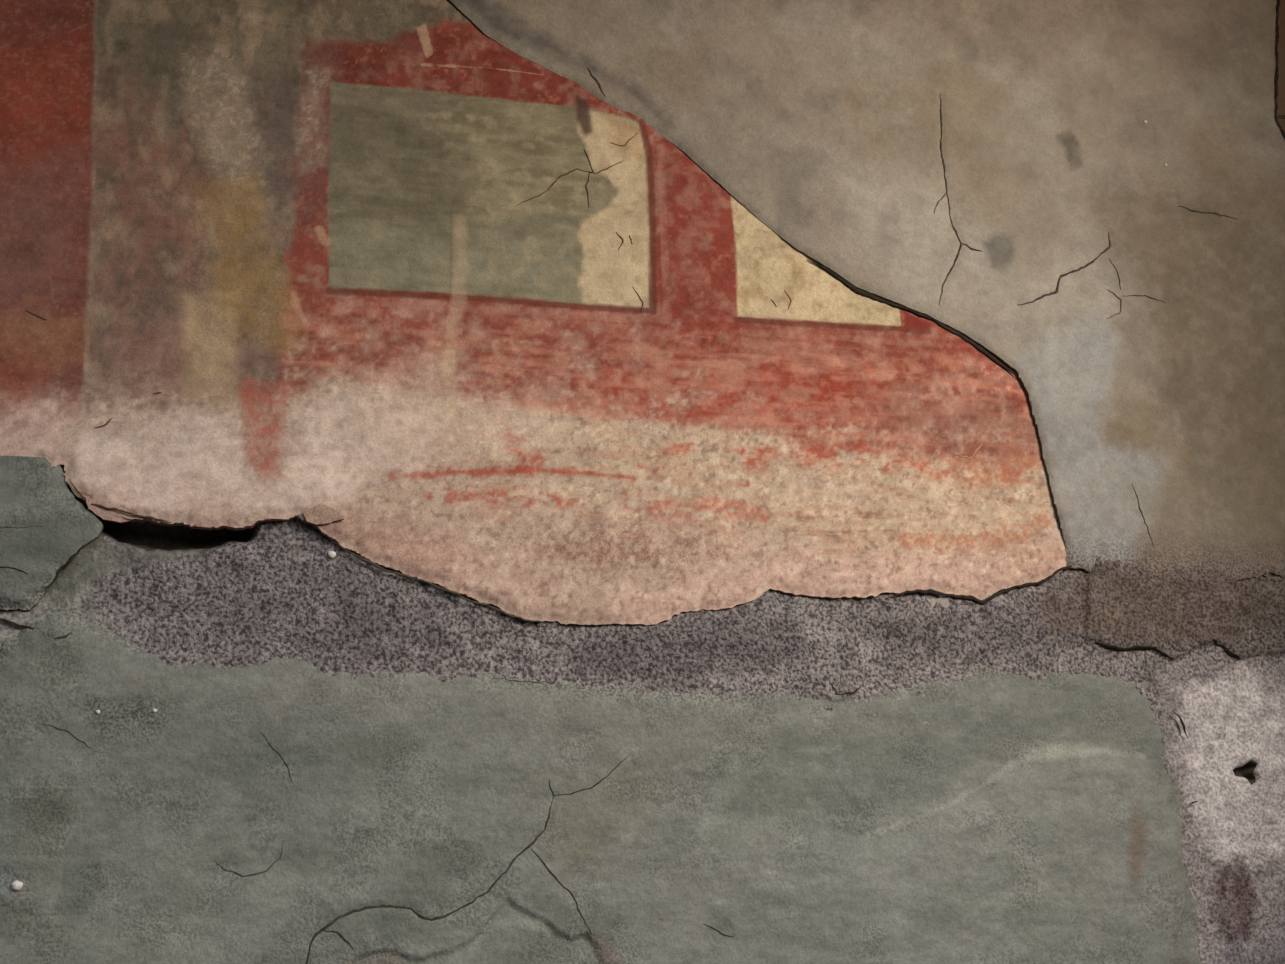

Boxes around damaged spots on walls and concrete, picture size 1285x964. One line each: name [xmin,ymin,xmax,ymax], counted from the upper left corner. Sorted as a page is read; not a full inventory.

peeling [414,23,543,75]
crack [516,132,638,206]
peeling [314,225,331,247]
crack [1017,232,1165,319]
crack [0,618,72,639]
flaking render [0,497,1285,964]
crack [305,753,631,964]